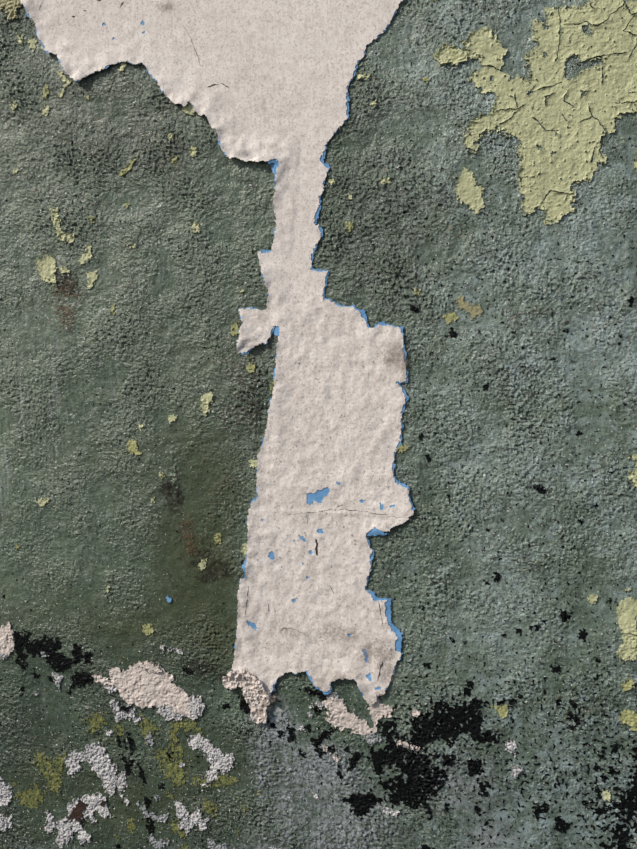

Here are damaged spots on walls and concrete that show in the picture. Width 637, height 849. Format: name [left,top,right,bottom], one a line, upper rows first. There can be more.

crack [557,2,637,64]
crack [505,85,603,131]
peeling [0,0,527,820]
peeling [555,699,584,730]
peeling [618,709,637,731]
peeling [572,739,637,849]
peeling [127,816,155,834]